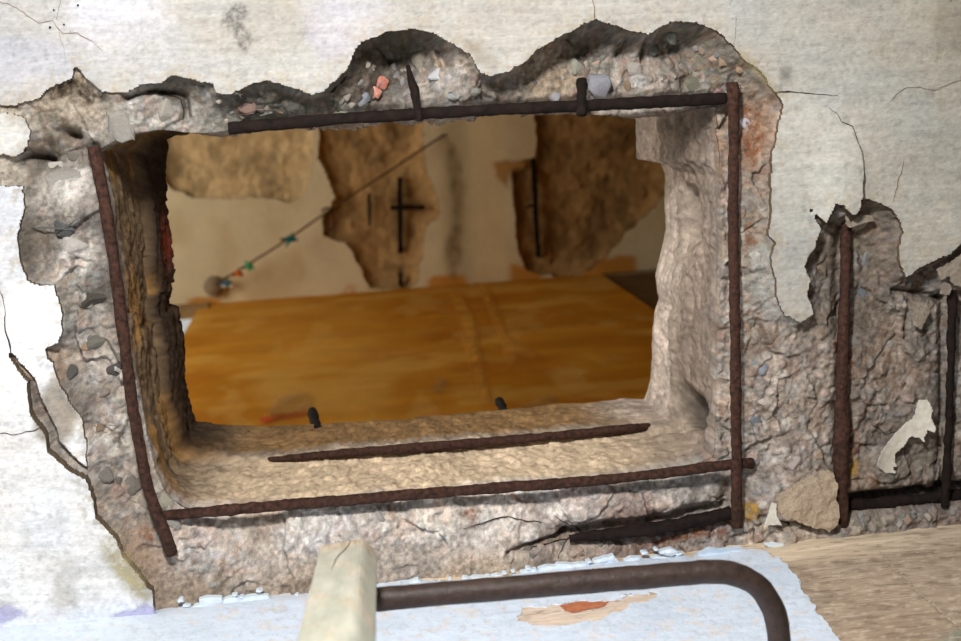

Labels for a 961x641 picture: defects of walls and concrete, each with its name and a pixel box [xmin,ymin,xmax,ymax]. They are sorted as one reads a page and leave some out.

crack [0,0,103,55]
crack [891,80,961,101]
crack [776,91,864,201]
spalling [0,19,961,529]
crack [0,292,12,355]
crack [464,516,581,557]